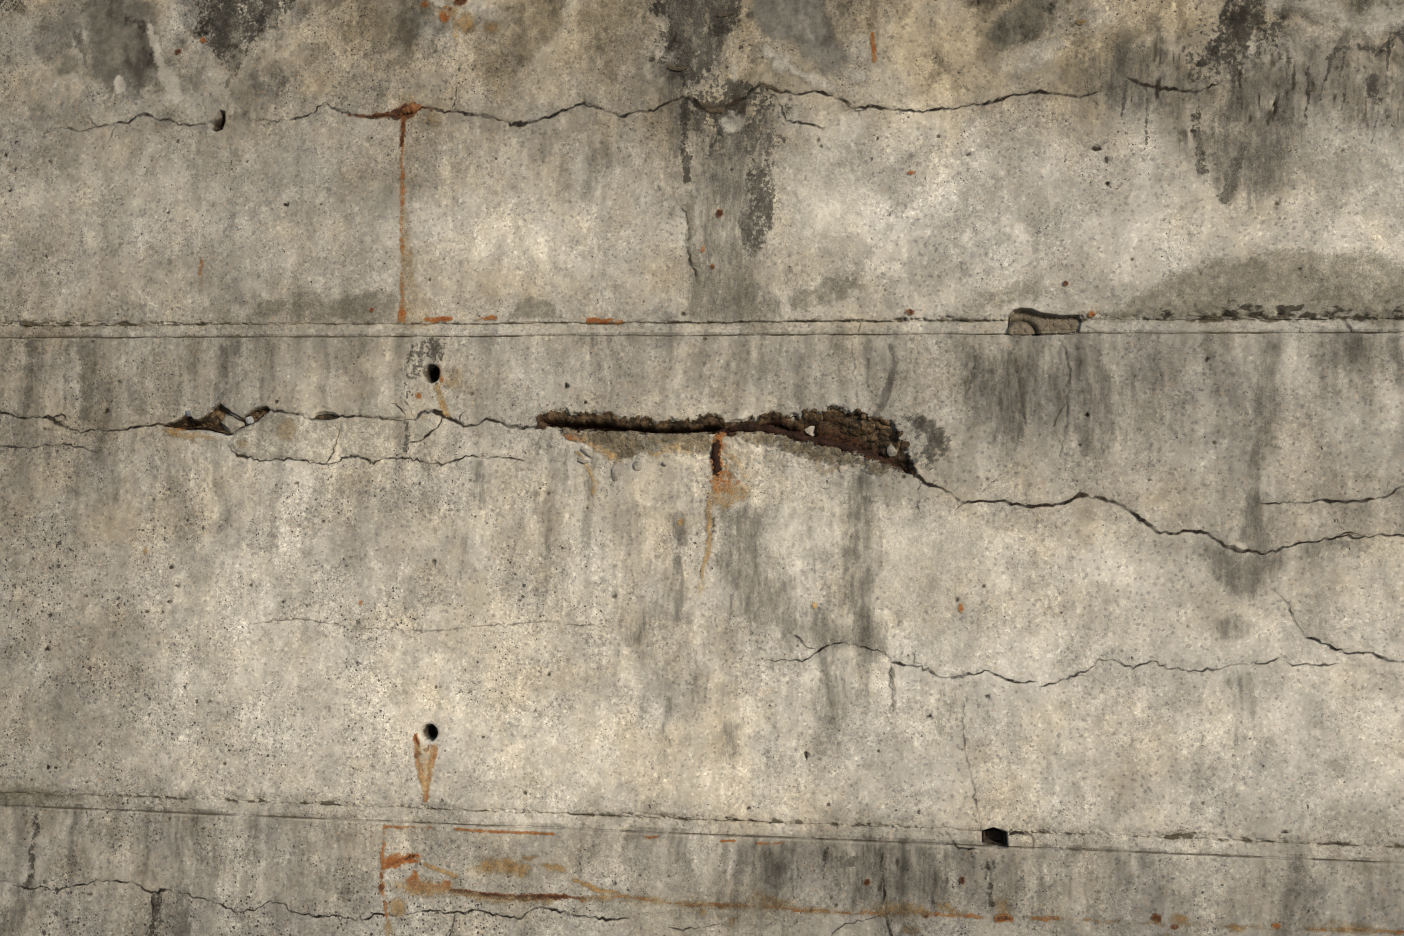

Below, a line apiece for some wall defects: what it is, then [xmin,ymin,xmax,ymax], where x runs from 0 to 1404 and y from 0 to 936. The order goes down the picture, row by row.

crack [263,74,1099,128]
leakage [1091,0,1404,208]
rust [347,94,453,324]
leakage [509,0,878,321]
leakage [1106,248,1404,362]
peeling [163,399,399,459]
crack [229,403,539,466]
spalling [536,401,952,493]
crack [913,474,1404,555]
rust [413,733,438,802]
crack [767,635,1213,805]
rust [378,824,1060,936]